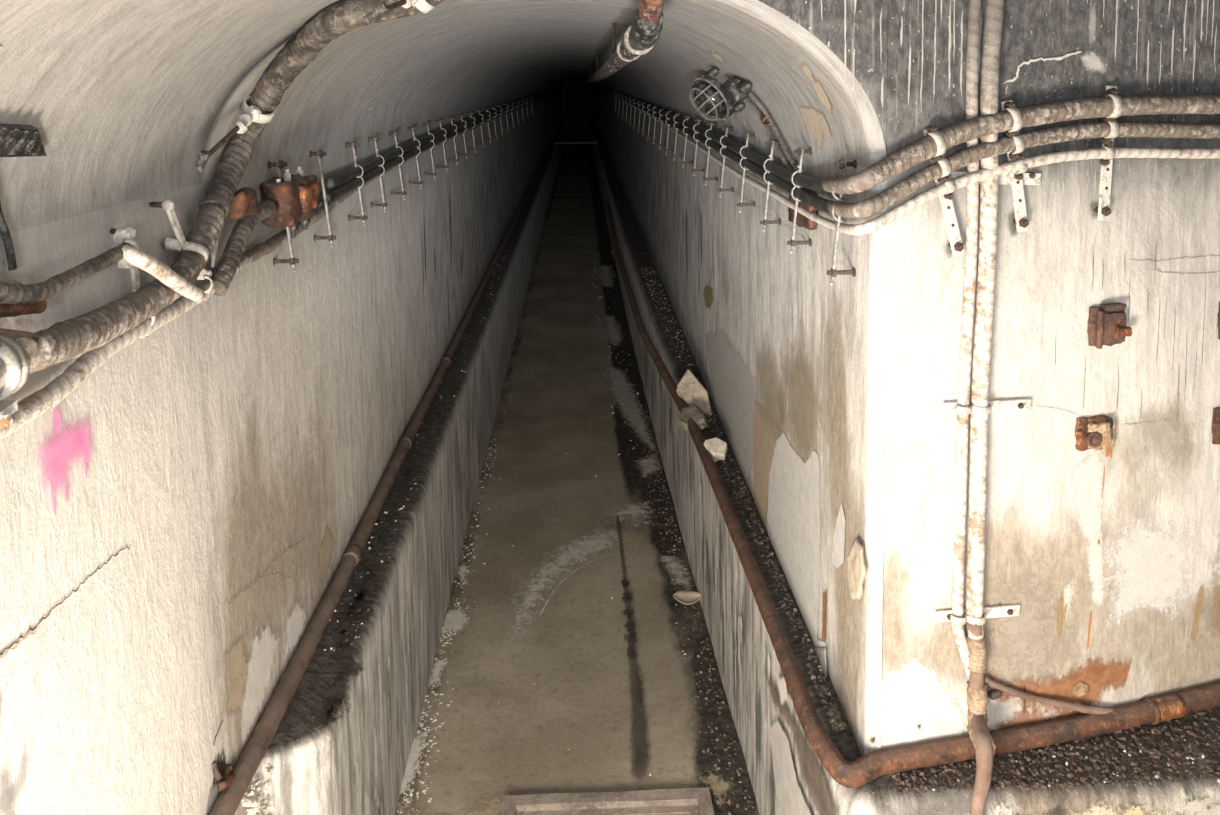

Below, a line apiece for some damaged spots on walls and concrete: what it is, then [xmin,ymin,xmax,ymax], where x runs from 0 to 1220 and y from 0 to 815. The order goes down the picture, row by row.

flaking render [800,64,833,149]
crack [0,546,130,660]
peeling [206,603,306,815]
damp [603,314,836,815]
peeling [706,332,846,678]
damp [985,575,1077,683]
corrosion [984,613,1132,729]
corrosion [1058,595,1067,635]
peeling [1063,581,1075,628]
peeling [1071,451,1194,627]
corrosion [1192,588,1220,640]